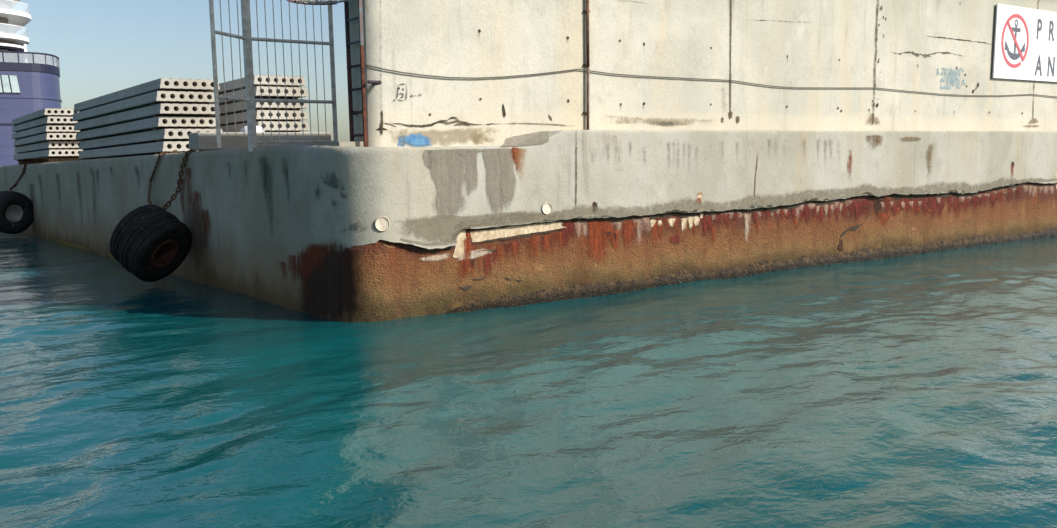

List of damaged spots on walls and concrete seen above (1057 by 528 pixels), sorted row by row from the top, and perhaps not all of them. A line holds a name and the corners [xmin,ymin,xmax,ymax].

crack [892,36,989,58]
rust [512,147,525,169]
rust [179,168,211,261]
crack [379,240,454,253]
rust [460,222,575,276]
rust [588,202,637,262]
rust [652,212,739,246]
damp [400,131,1057,246]
crack [475,157,1056,251]
rust [753,188,1021,233]
rust [279,244,360,321]